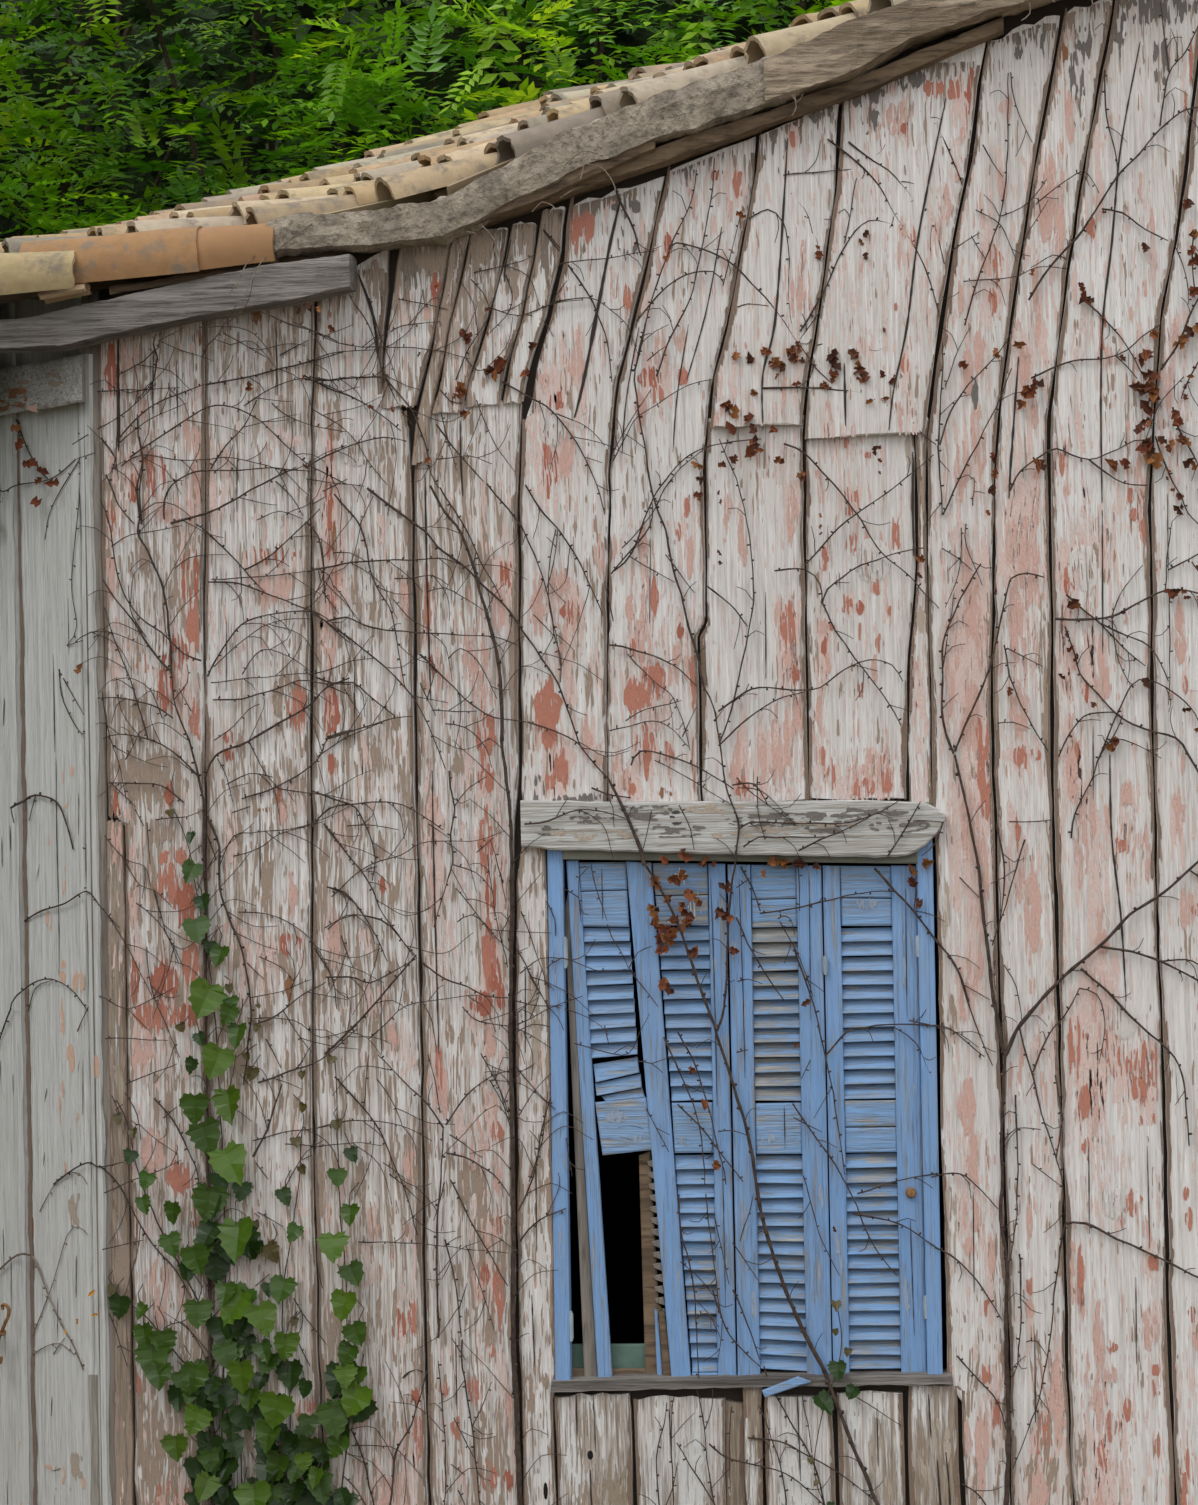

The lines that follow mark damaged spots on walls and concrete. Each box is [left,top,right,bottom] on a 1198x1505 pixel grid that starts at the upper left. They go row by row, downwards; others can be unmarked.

peeling [93,139,903,1505]